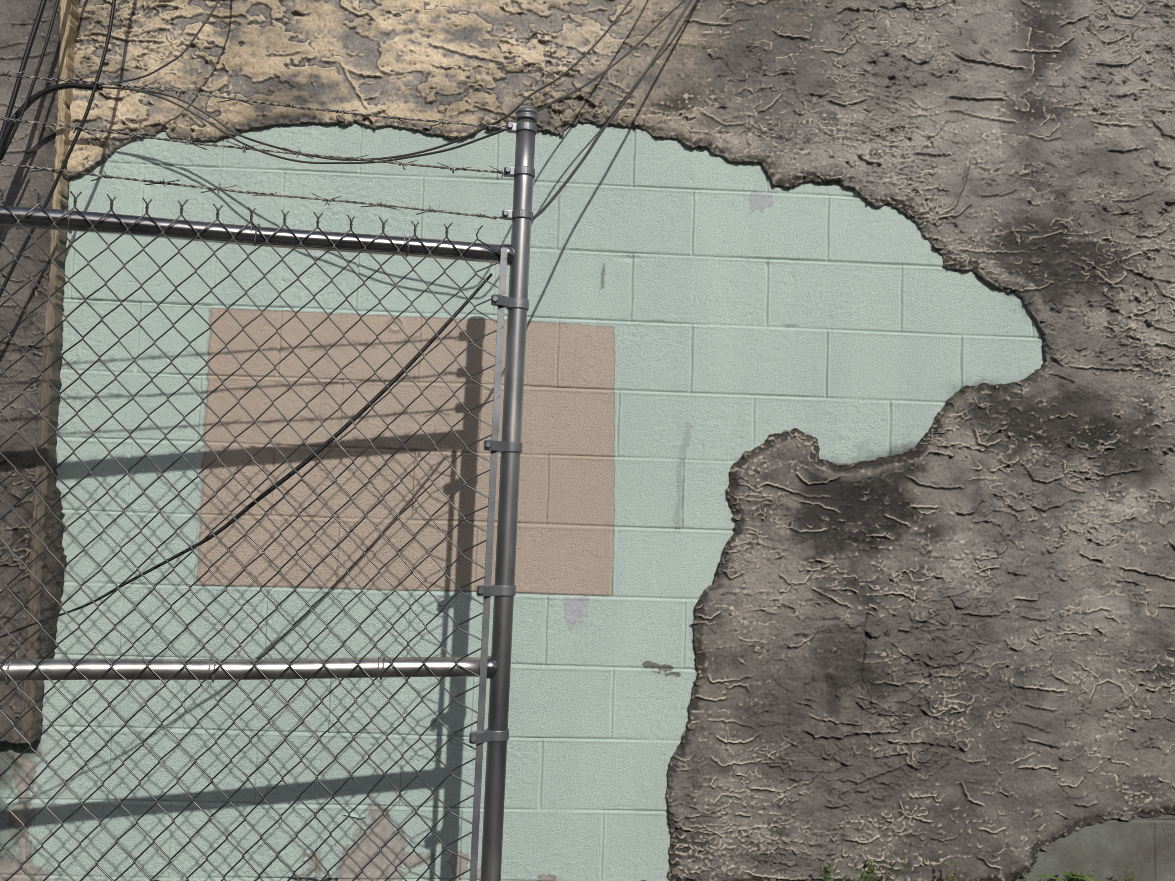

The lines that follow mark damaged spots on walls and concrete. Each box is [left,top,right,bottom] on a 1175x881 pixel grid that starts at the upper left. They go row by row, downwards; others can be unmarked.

spalling [68,115,506,178]
spalling [537,112,996,287]
spalling [666,383,999,881]
peeling [642,661,681,677]
peeling [299,850,321,878]
peeling [338,804,434,881]
peeling [447,851,481,881]
spalling [1007,808,1175,881]